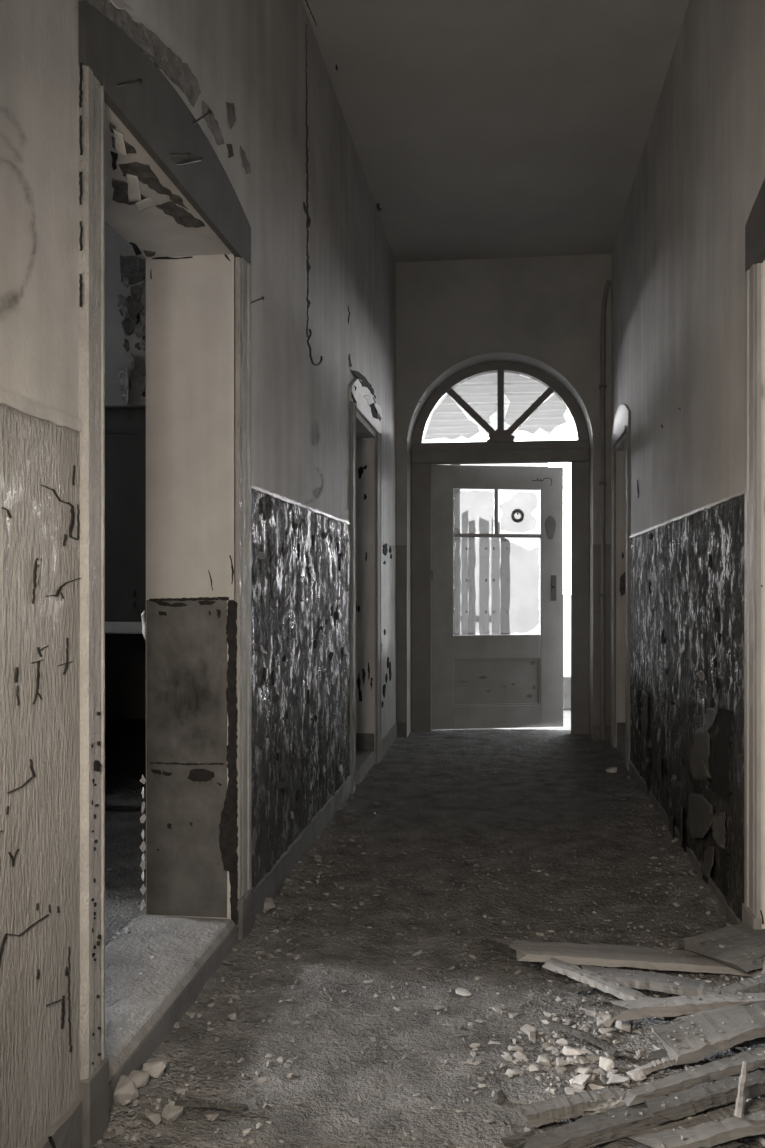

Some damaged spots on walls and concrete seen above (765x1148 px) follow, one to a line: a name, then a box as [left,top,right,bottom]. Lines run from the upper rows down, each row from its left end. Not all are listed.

flaking render [87,0,251,174]
flaking render [109,122,205,228]
crack [303,0,317,337]
peeling [351,370,383,422]
peeling [262,495,273,521]
peeling [288,514,316,579]
peeling [284,595,349,660]
peeling [639,581,671,637]
peeling [263,655,288,730]
peeling [357,657,392,708]
peeling [635,607,735,898]